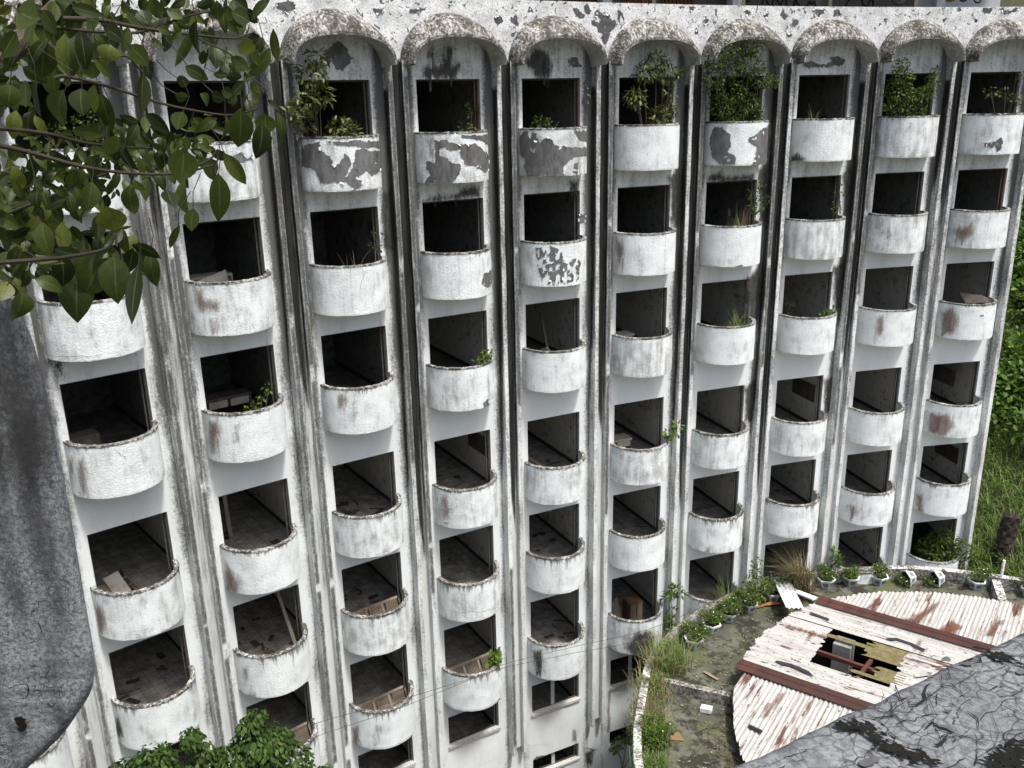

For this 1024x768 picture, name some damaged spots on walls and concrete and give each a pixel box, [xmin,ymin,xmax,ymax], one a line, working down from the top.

peeling [573,4,624,45]
peeling [292,120,381,190]
peeling [425,134,490,183]
peeling [519,83,591,176]
peeling [710,126,736,165]
peeling [535,246,581,285]
rust [941,308,959,336]
rust [927,412,953,437]
leakage [155,258,238,750]
rust [900,602,940,629]
rust [939,621,963,633]
crack [835,641,1024,768]